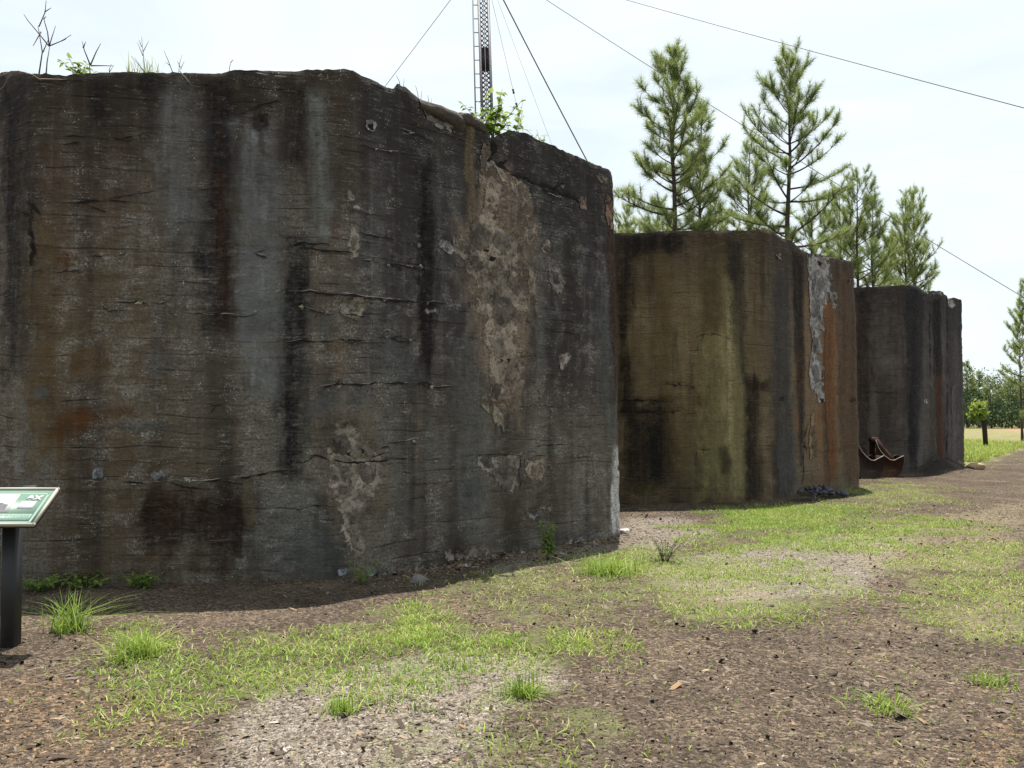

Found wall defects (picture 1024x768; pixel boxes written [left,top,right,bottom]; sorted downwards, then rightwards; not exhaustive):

crack [15,191,154,273]
damp [195,82,309,479]
crack [76,437,451,508]
spalling [326,420,390,577]
crack [284,289,443,347]
spalling [438,140,566,431]
spalling [477,452,552,494]
damp [599,233,683,434]
damp [697,244,761,502]
spalling [807,253,838,460]